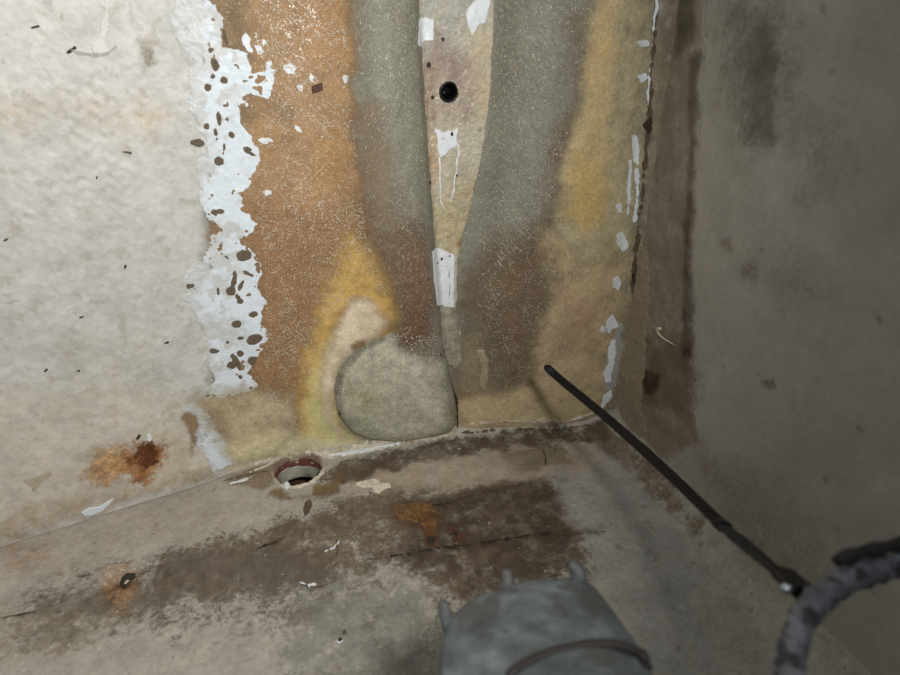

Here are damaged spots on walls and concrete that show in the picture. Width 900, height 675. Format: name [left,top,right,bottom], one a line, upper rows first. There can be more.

peeling [169,0,653,472]
damp [195,0,657,499]
crack [630,0,659,294]
corrosion [101,562,140,614]
corrosion [82,434,165,487]
corrosion [392,501,443,546]